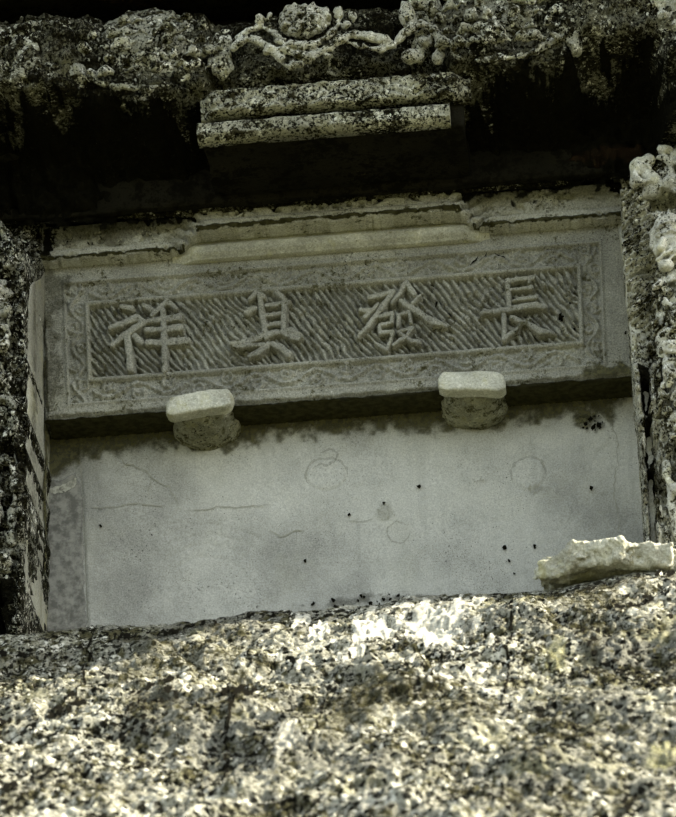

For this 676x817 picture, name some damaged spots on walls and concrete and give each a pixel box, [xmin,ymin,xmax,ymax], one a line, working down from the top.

crack [490,597,514,705]
crack [218,694,236,786]